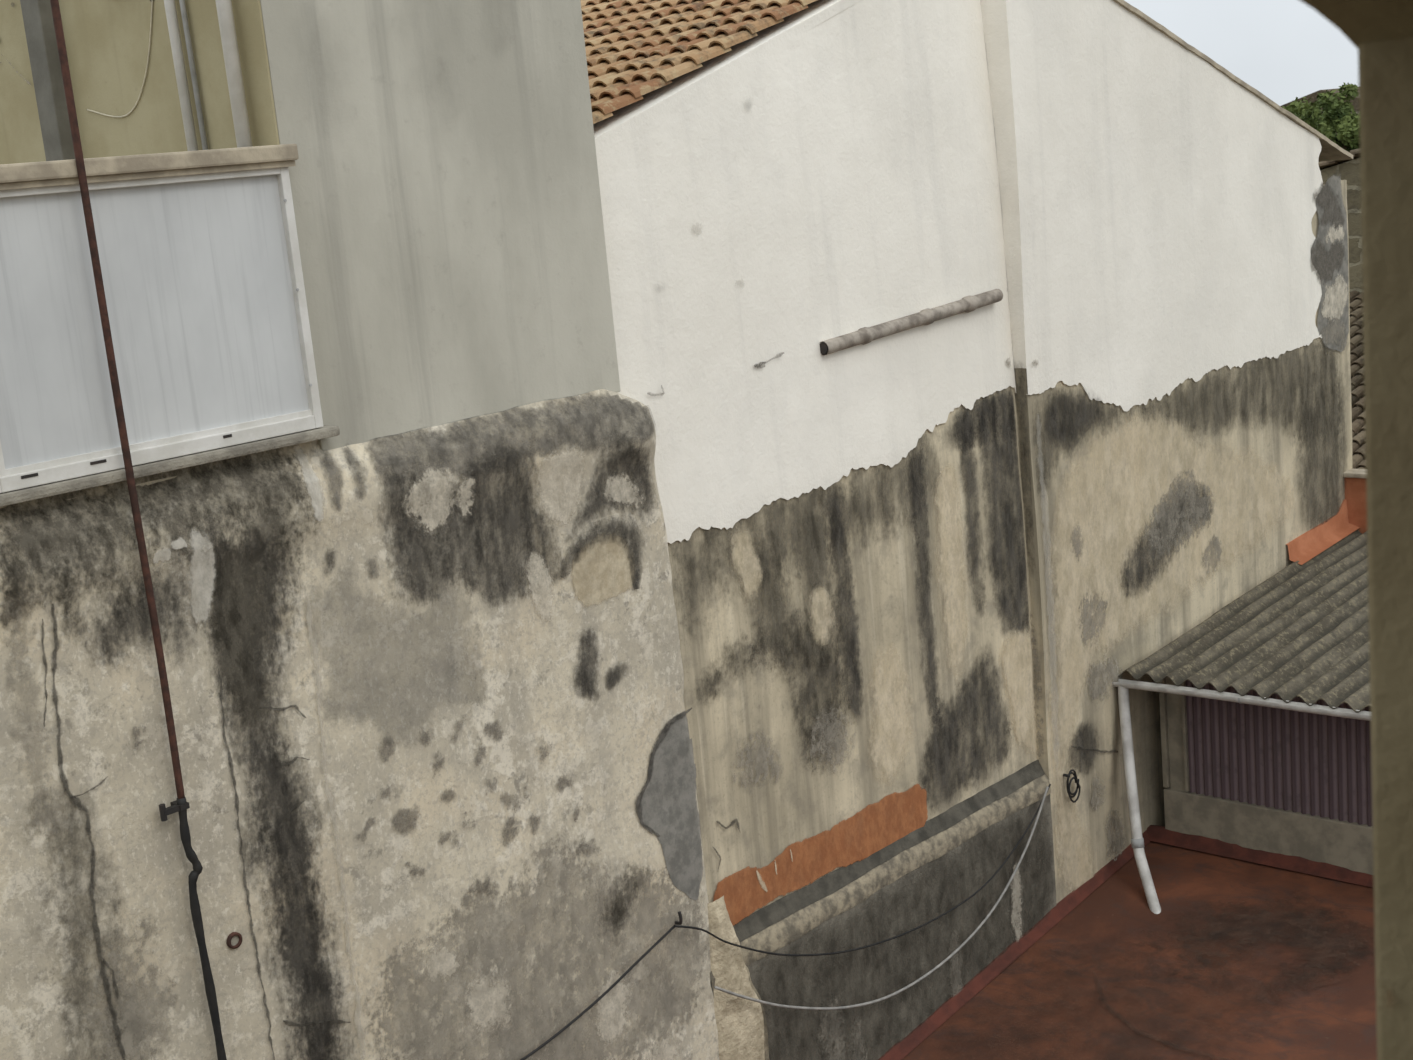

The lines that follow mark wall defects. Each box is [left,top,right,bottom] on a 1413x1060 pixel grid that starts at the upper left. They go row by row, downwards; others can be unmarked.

crack [41,604,126,1060]
crack [218,669,350,1060]
damp [0,393,654,1060]
damp [369,840,706,1060]
peeling [635,708,928,926]
damp [674,341,1346,807]
damp [1071,725,1125,860]